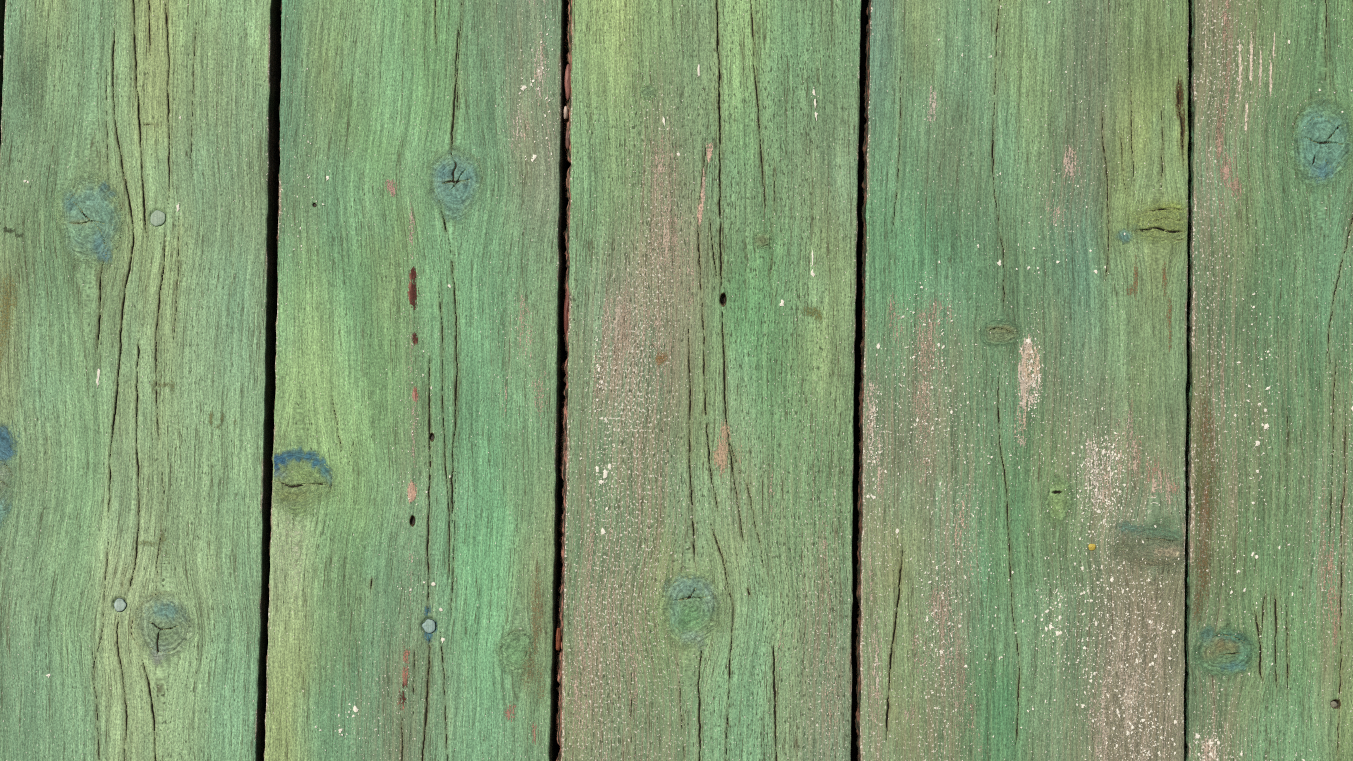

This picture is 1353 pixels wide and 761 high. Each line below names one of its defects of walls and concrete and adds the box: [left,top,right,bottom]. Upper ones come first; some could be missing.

crack [72,0,197,761]
crack [401,1,482,761]
crack [677,0,775,761]